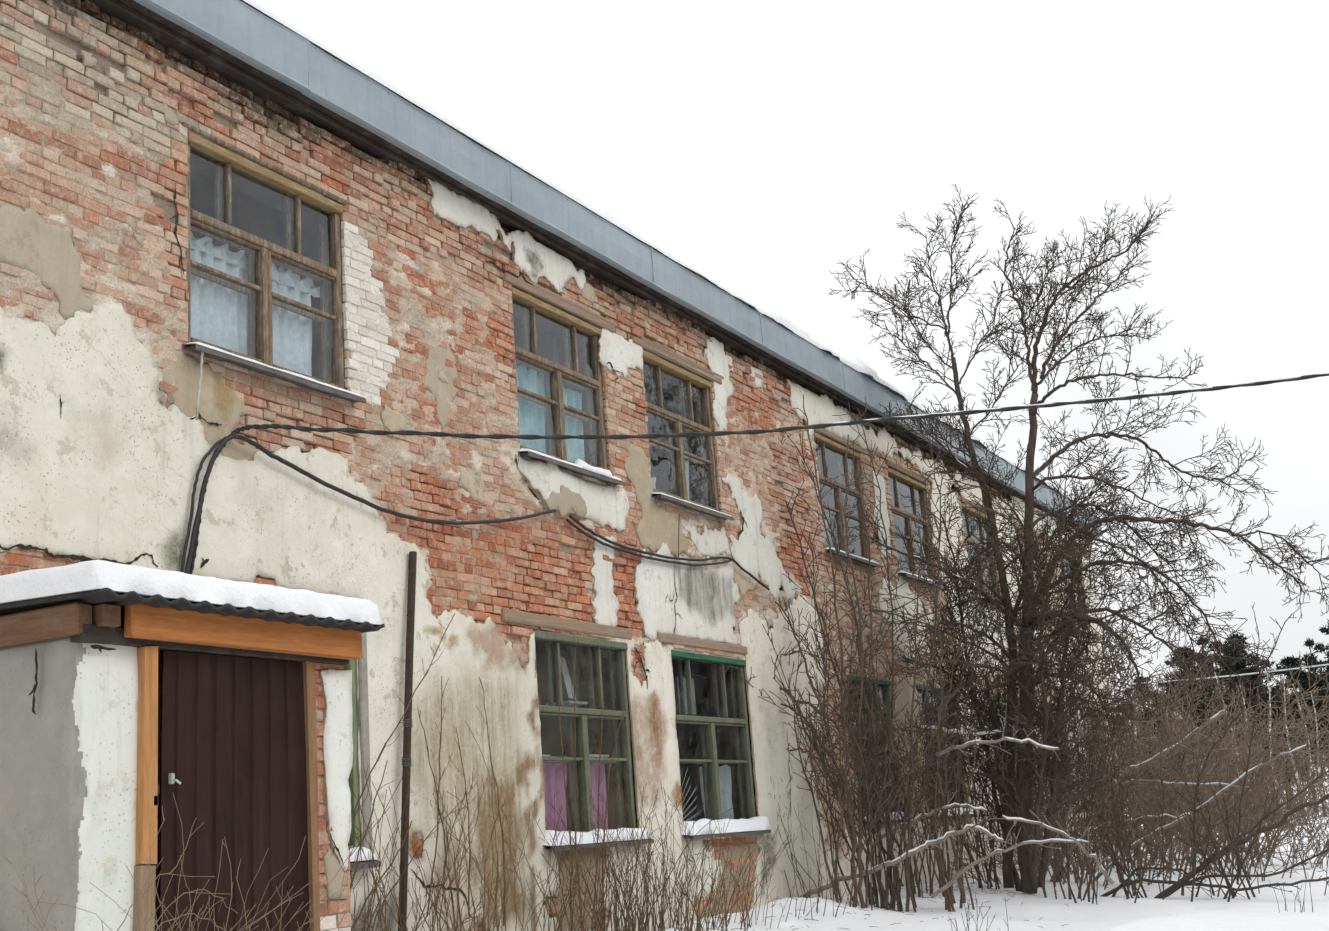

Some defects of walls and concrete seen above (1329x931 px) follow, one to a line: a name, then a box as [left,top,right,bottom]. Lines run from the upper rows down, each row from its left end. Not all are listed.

flaking render [0,0,260,461]
crack [0,544,158,568]
leakage [432,628,526,667]
leakage [419,695,545,931]
flaking render [341,179,858,861]
leakage [633,703,665,800]